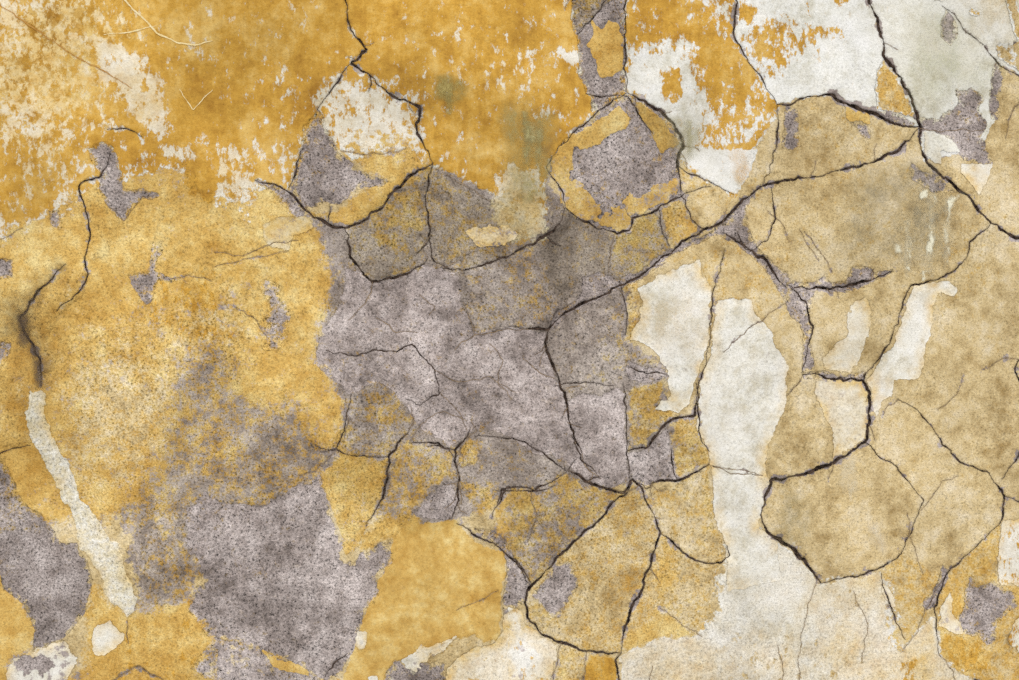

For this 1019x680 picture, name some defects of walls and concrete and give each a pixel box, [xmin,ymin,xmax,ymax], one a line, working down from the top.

spalling [0,259,13,279]
crack [19,128,158,376]
crack [165,240,298,281]
spalling [255,110,388,251]
spalling [548,0,683,233]
spalling [313,193,957,592]
crack [255,0,1019,680]
spalling [844,0,1019,195]
spalling [0,454,93,680]
peeling [91,620,125,656]
spalling [184,473,393,680]
spalling [923,519,1019,652]